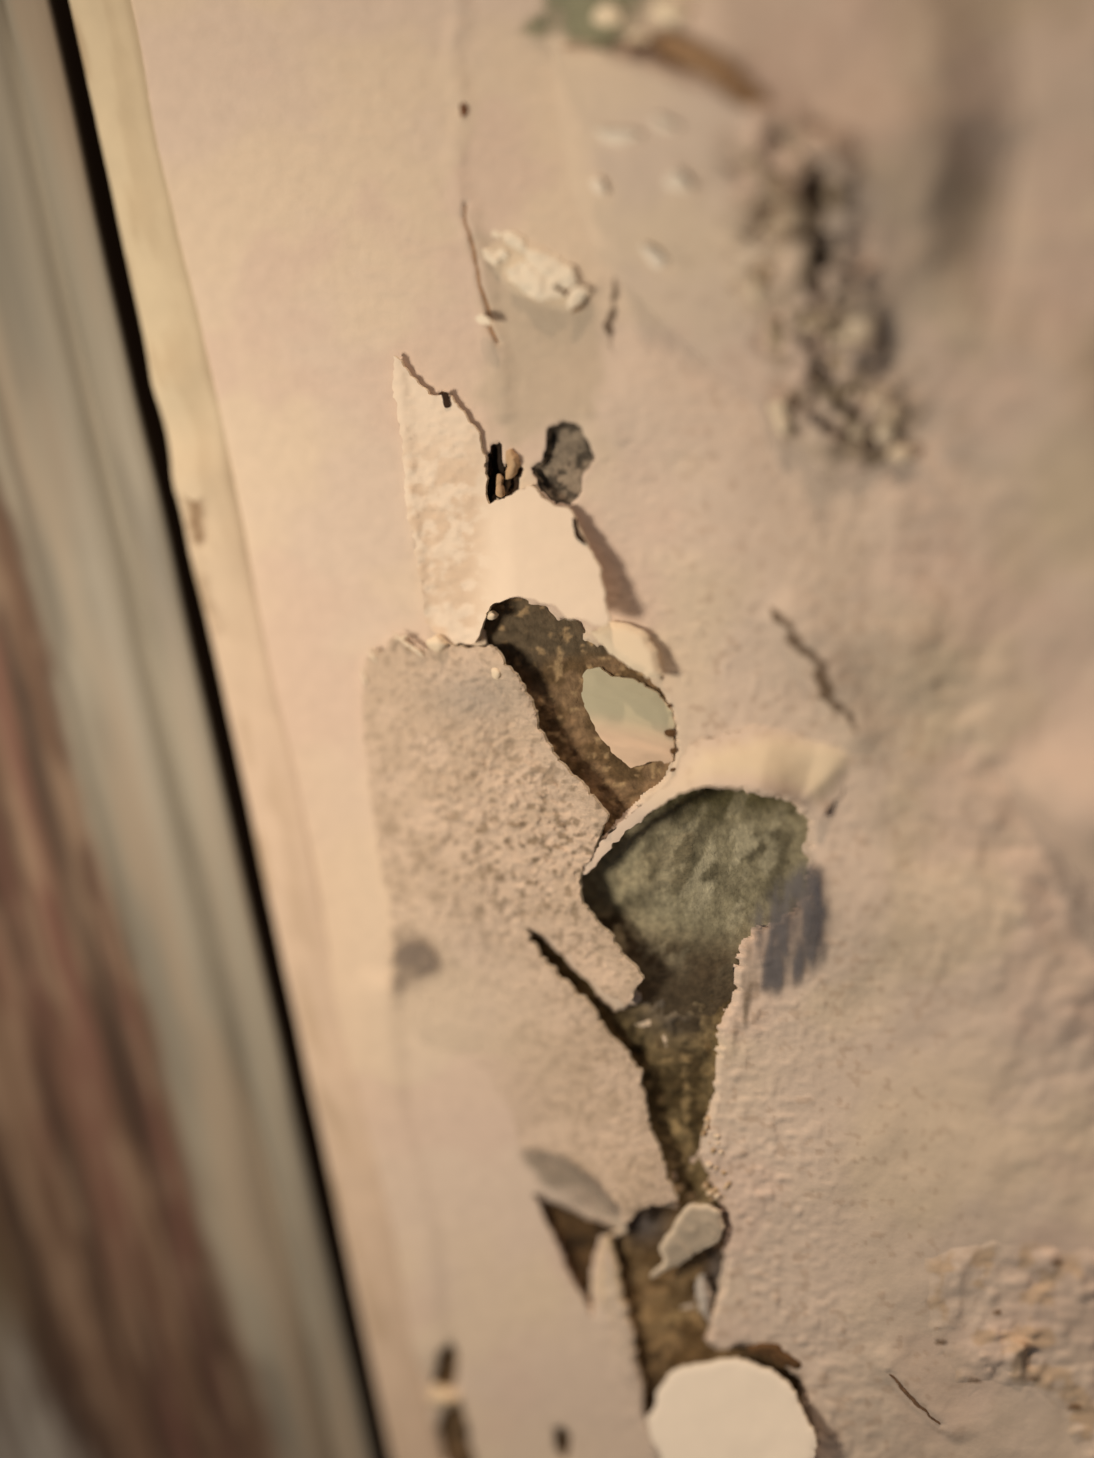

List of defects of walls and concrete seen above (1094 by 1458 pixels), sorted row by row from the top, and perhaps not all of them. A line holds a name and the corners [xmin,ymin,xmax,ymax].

crack [460,103,468,117]
crack [463,205,498,342]
peeling [360,356,818,1458]